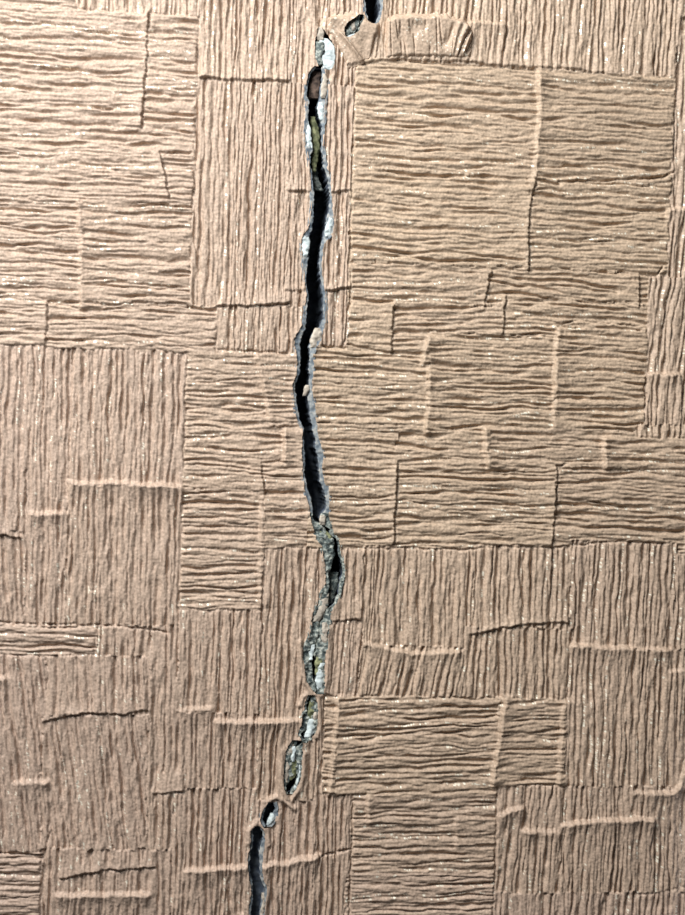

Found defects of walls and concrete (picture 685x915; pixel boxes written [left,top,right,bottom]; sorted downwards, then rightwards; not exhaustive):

crack [344,0,383,37]
crack [246,67,347,915]